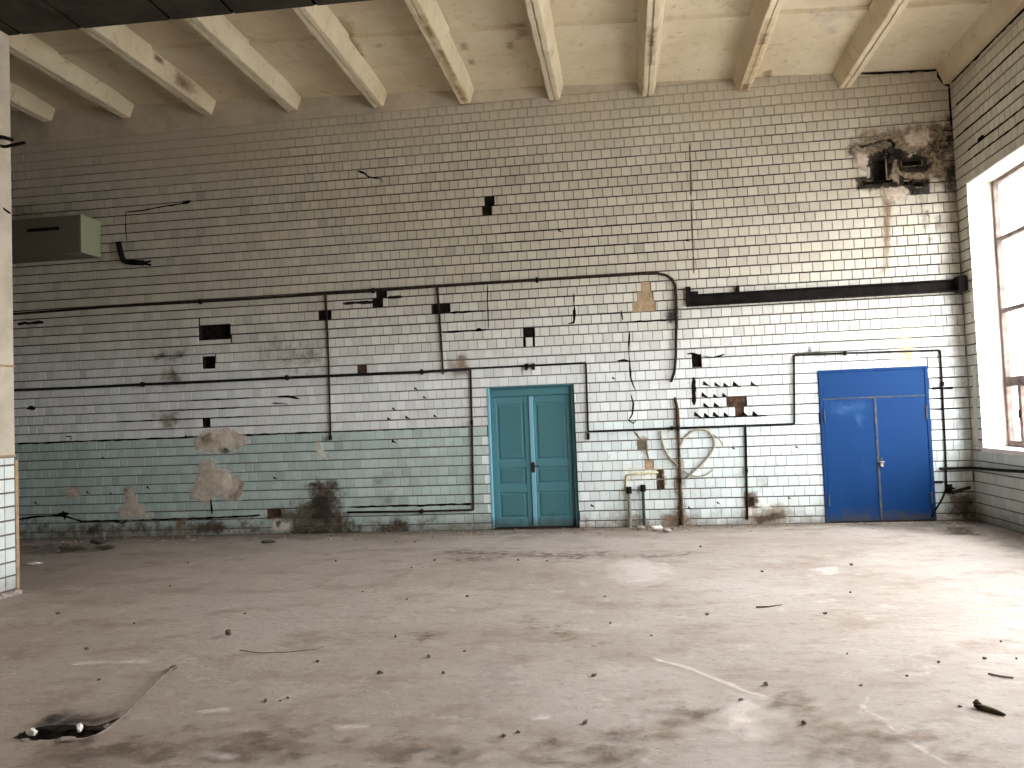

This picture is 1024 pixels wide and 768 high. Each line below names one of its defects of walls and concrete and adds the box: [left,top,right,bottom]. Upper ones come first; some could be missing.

flaking render [850,125,947,200]
peeling [483,196,494,216]
peeling [632,282,656,312]
peeling [199,324,231,341]
peeling [694,381,759,418]
flaking render [185,419,246,502]
flaking render [110,487,150,519]